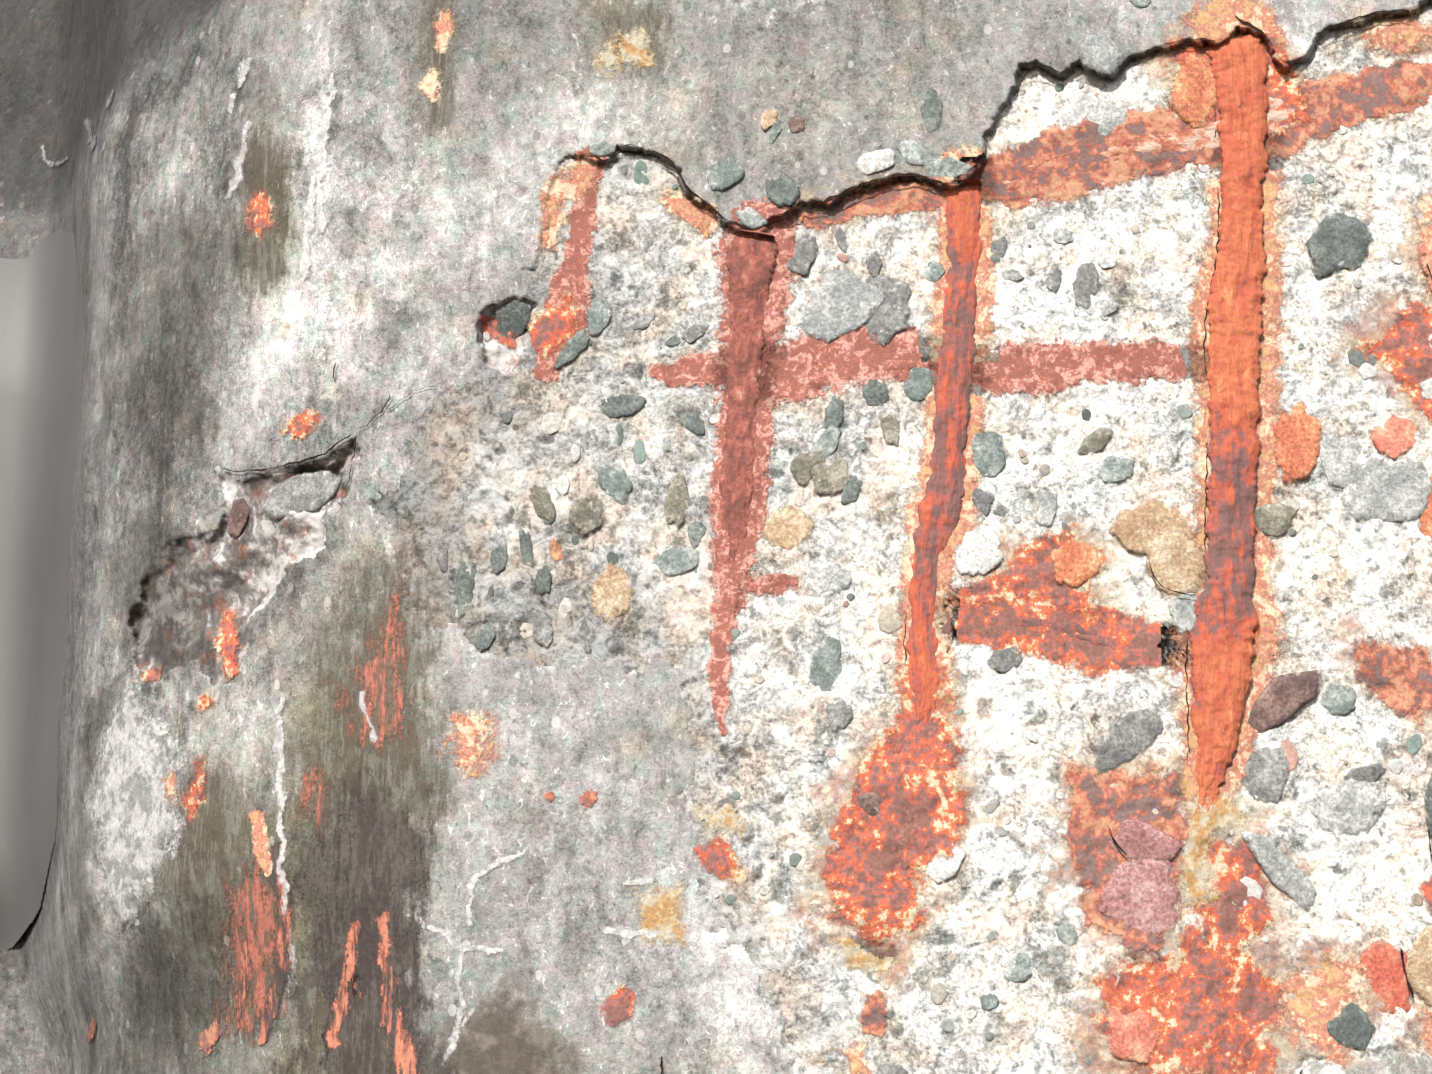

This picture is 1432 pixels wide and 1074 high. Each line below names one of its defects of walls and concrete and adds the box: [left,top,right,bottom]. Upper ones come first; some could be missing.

rust [1260,34,1312,135]
rust [537,156,599,252]
rust [1344,194,1432,422]
spalling [85,440,360,929]
crack [223,386,435,485]
rust [734,570,805,600]
spalling [368,0,1432,1074]
rust [966,523,1116,622]
rust [1334,617,1432,726]
rust [196,576,456,1074]
rust [798,658,973,1074]
rust [1047,754,1387,1074]